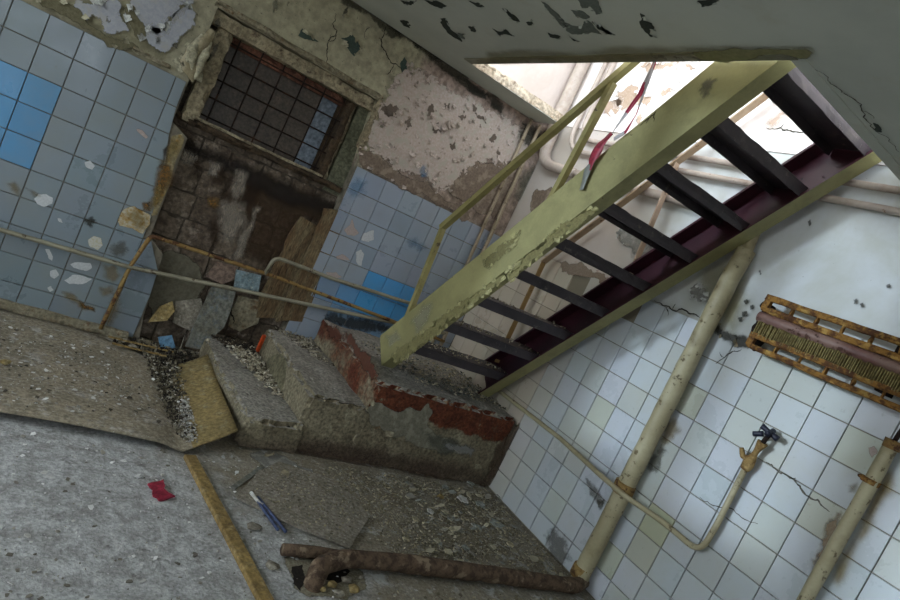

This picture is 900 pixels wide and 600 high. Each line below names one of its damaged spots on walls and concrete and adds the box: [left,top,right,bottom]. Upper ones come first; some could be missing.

peeling [36,0,196,55]
crack [364,27,402,74]
peeling [400,0,476,42]
peeling [541,0,615,42]
peeling [602,48,812,124]
crack [815,69,899,152]
peeling [358,57,530,222]
flaking render [148,250,206,320]
spalling [234,269,261,292]
crack [657,302,700,318]
spalling [368,400,474,456]
crack [766,462,830,512]